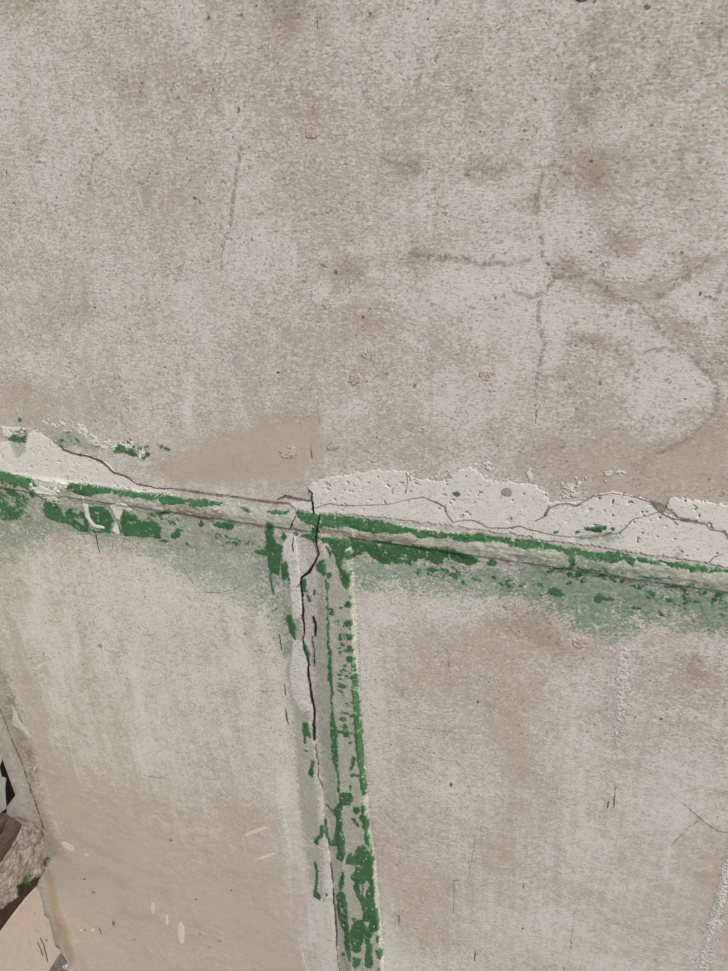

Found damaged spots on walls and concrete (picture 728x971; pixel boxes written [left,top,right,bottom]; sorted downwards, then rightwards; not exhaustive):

flaking render [0,414,223,547]
crack [54,441,728,971]
flaking render [198,461,728,971]